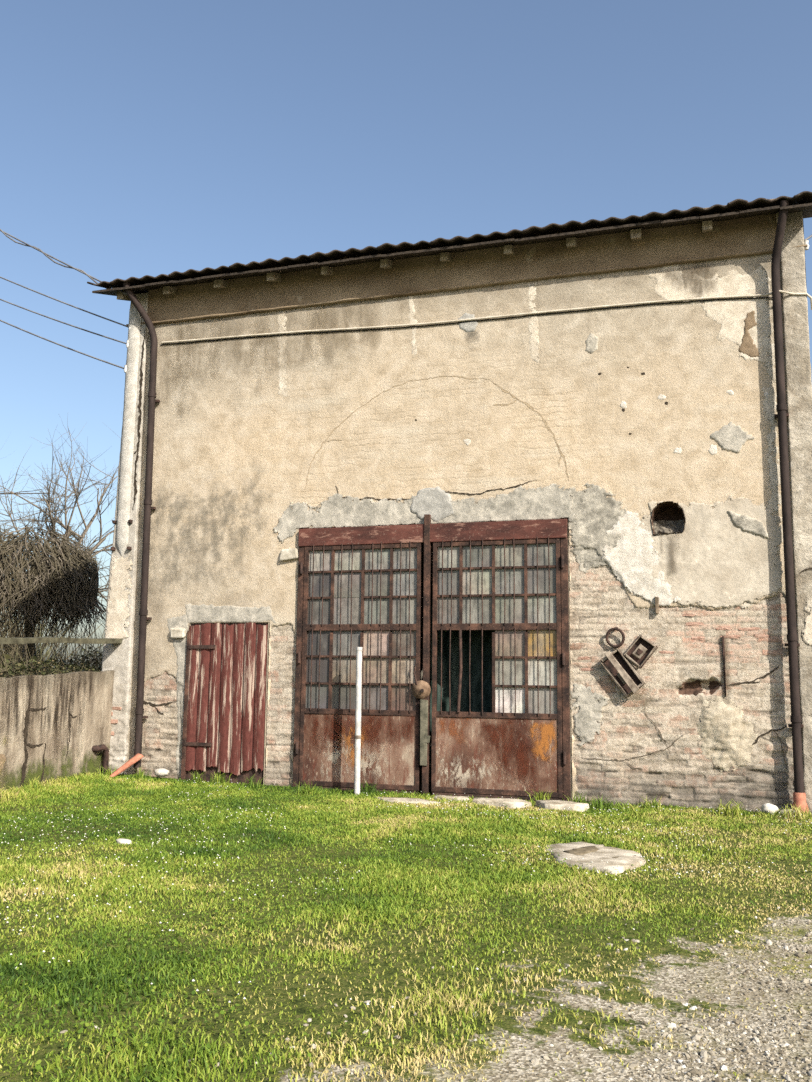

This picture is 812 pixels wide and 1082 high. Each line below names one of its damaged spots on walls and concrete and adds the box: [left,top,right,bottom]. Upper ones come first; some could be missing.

peeling [649,260,785,515]
peeling [800,600,812,646]
water stain [8,671,92,729]
flaking render [569,507,803,812]
crack [730,666,779,685]
rust [312,716,411,775]
rust [437,753,491,785]
rust [483,720,555,778]
crack [582,711,683,770]